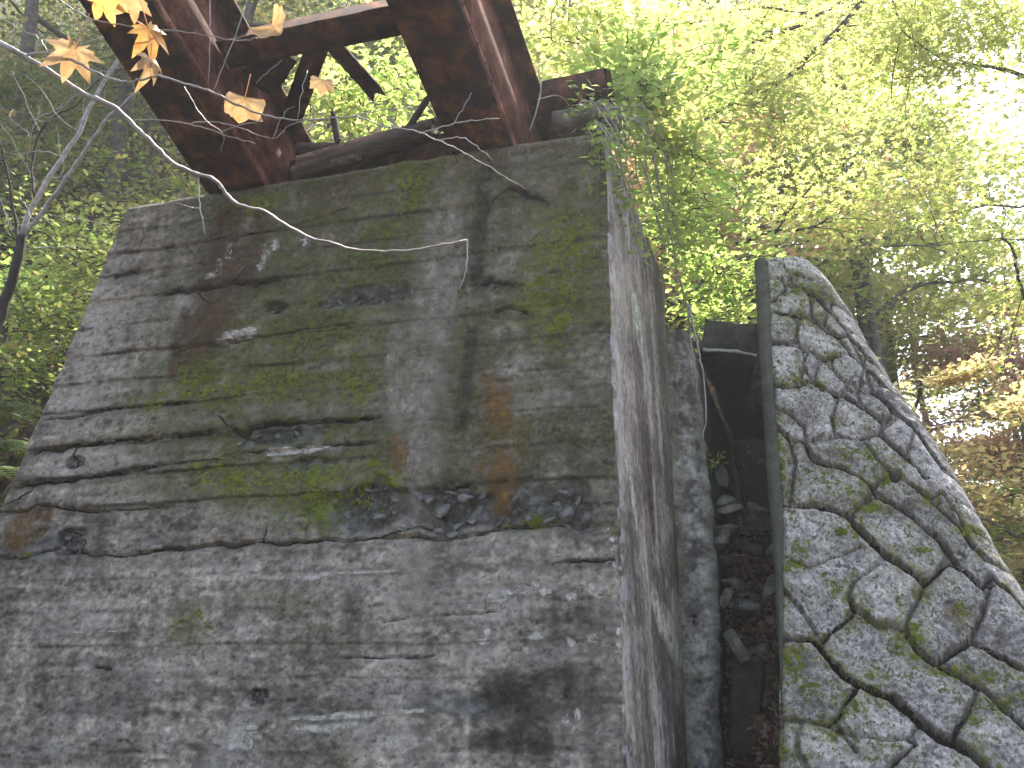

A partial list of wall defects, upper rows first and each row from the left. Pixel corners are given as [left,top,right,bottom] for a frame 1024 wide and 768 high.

crack [4,402,602,560]
spalling [345,480,594,539]
leakage [484,666,574,713]
leakage [476,726,565,752]